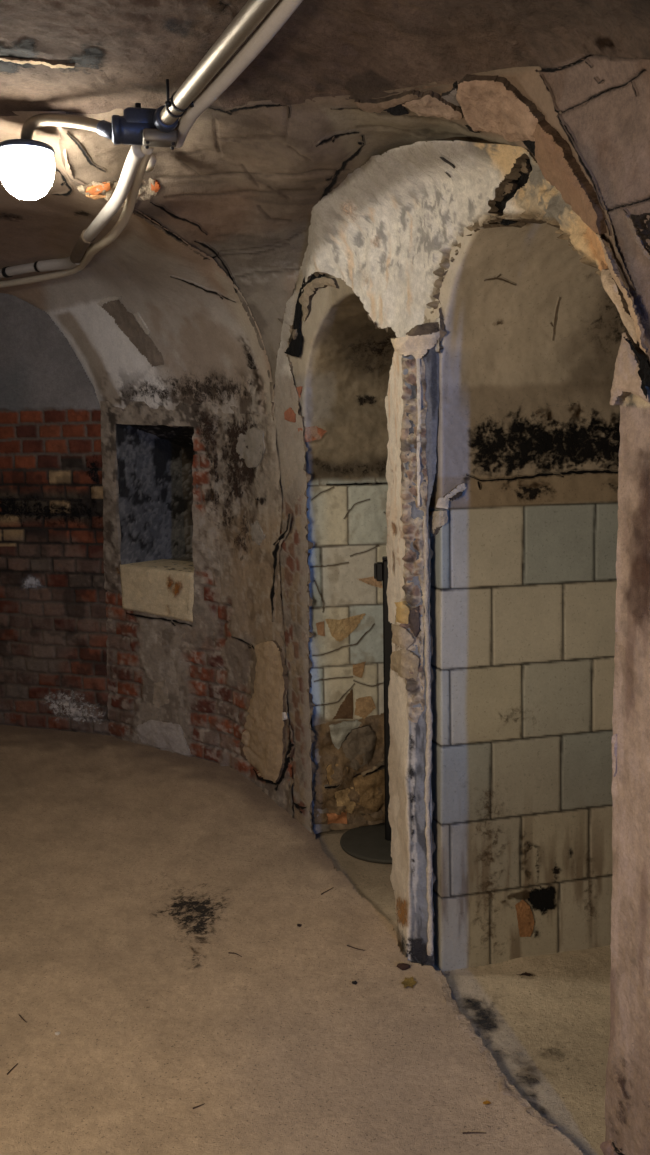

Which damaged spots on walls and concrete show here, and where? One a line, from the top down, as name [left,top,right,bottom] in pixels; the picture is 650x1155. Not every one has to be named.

crack [208,102,292,118]
crack [315,129,365,201]
crack [495,159,532,226]
crack [535,55,650,236]
crack [136,200,238,303]
peeling [330,74,650,405]
crack [284,274,339,357]
water stain [122,348,266,559]
crack [270,481,388,622]
efflorescence [44,690,104,724]
crack [312,623,384,707]
crack [252,725,306,814]